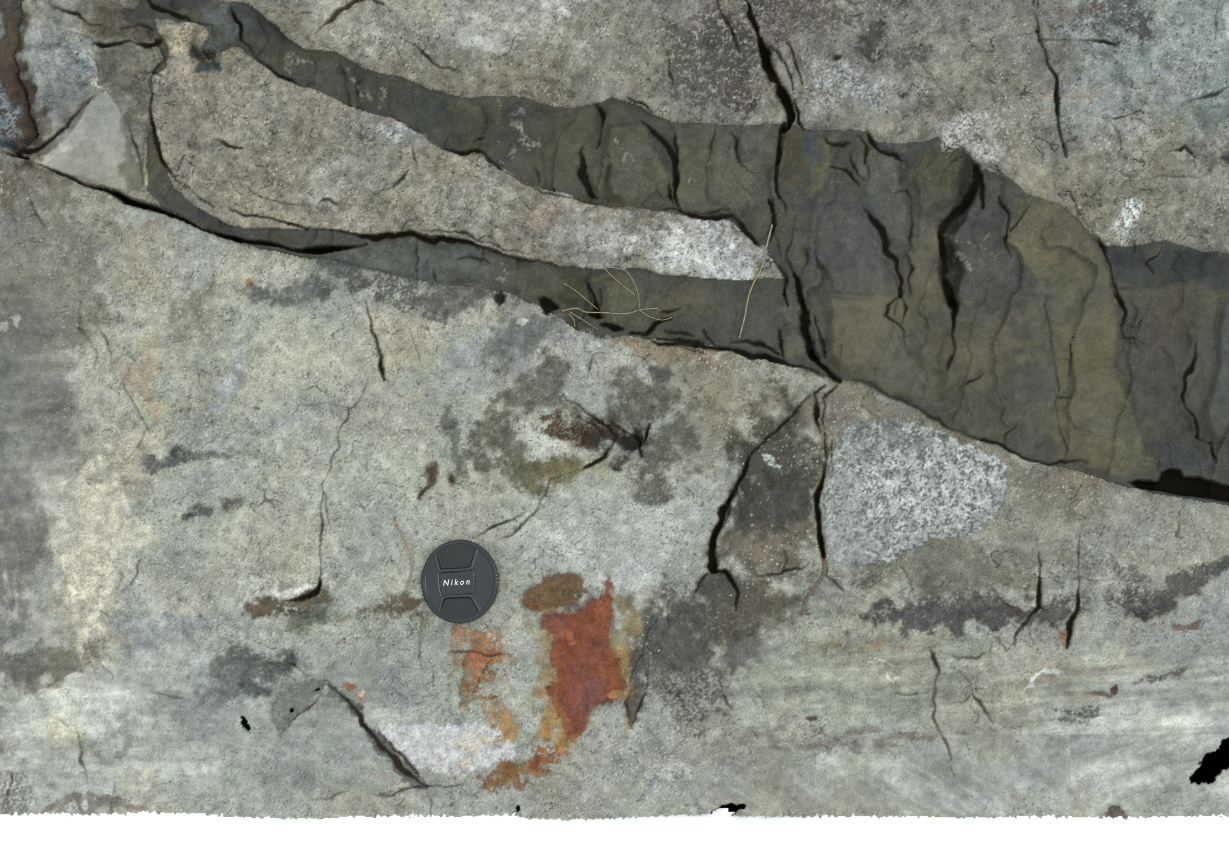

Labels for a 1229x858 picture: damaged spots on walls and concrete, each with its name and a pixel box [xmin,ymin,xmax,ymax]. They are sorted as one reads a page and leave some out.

crack [394,105,605,205]
crack [587,5,901,429]
crack [868,164,1010,383]
crack [1036,27,1067,157]
crack [708,454,751,606]
crack [814,468,827,576]
crack [341,695,422,793]
corrosion [456,627,517,741]
corrosion [478,579,641,794]